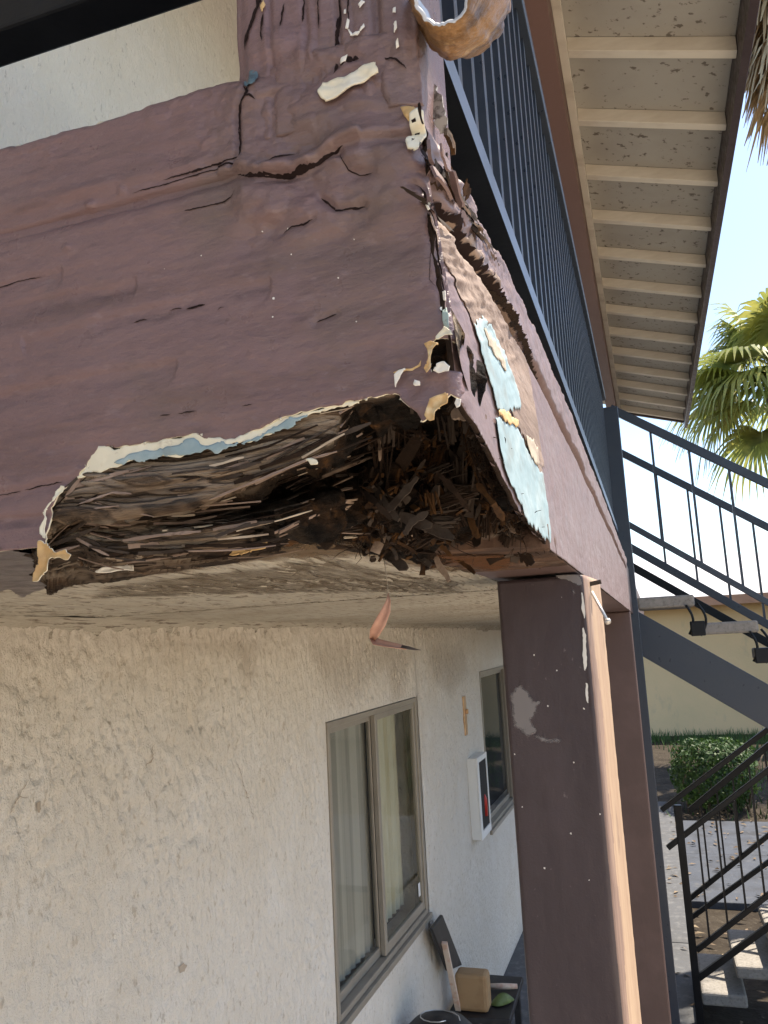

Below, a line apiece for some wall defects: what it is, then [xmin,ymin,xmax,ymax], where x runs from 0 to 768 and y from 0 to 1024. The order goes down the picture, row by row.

crack [244,0,359,72]
peeling [317,55,378,102]
crack [134,86,371,211]
peeling [400,85,448,151]
crack [284,198,364,233]
peeling [393,205,551,543]
peeling [77,400,360,479]
peeling [32,486,71,582]
peeling [95,565,134,573]
peeling [229,542,267,556]
peeling [511,686,559,742]